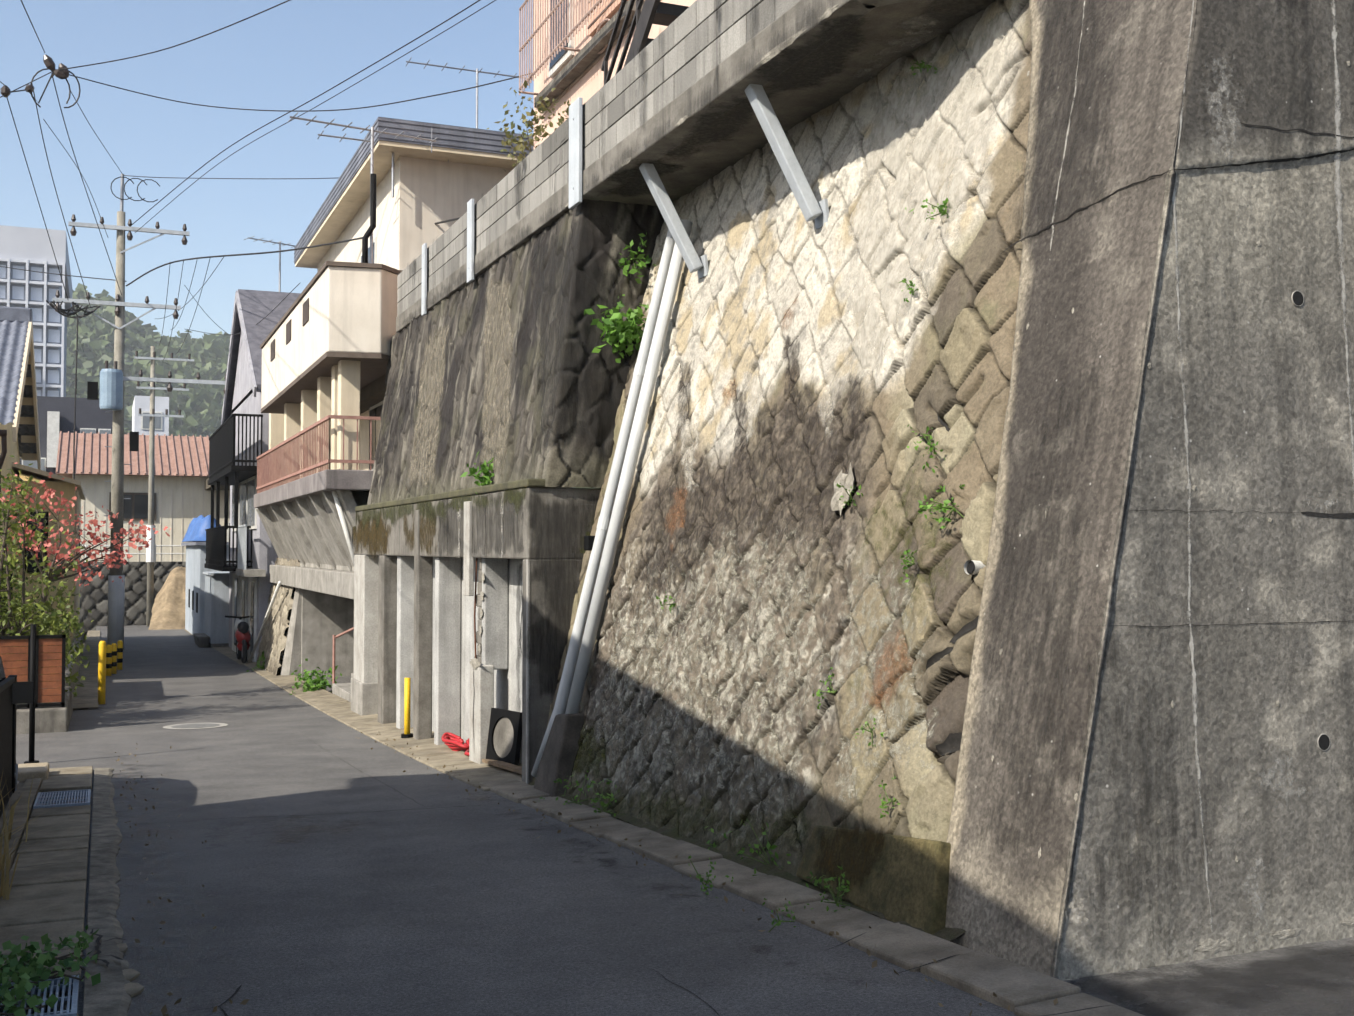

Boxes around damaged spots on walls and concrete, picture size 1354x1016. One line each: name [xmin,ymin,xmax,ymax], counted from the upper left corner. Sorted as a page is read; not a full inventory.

damp [592,66,753,196]
crack [1001,122,1354,254]
damp [635,0,1016,601]
crack [1124,509,1354,518]
crack [1115,619,1354,627]